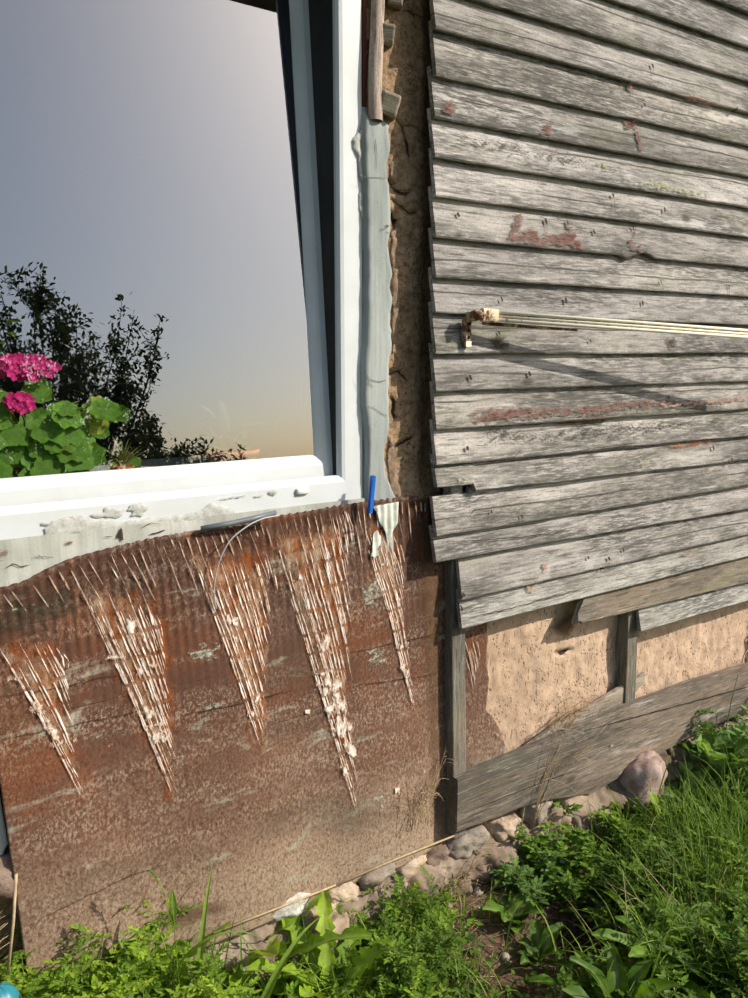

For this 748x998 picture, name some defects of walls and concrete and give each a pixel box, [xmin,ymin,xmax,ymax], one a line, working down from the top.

crack [396,118,418,158]
peeling [48,559,103,623]
peeling [91,502,149,518]
peeling [108,525,272,604]
peeling [279,502,426,564]
corrosion [0,642,83,794]
corrosion [90,593,177,800]
corrosion [193,513,418,806]